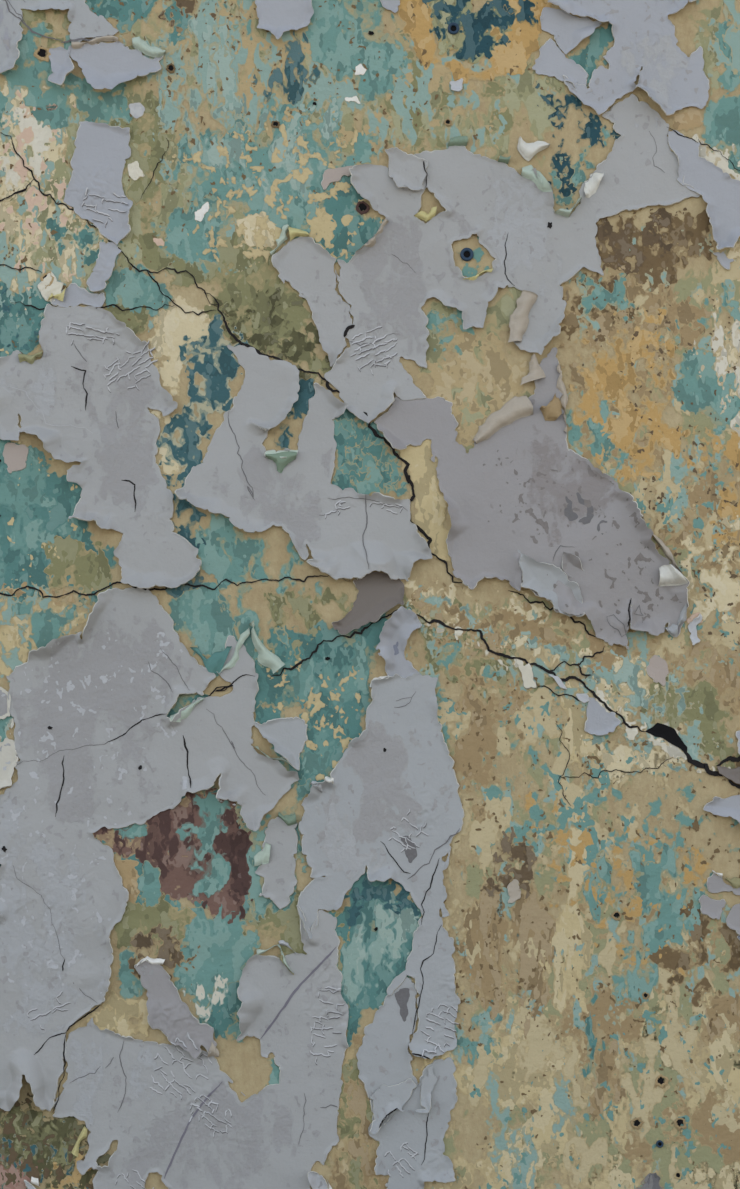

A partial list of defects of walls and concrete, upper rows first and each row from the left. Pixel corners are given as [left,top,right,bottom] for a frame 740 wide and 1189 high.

flaking render [657,328,690,433]
flaking render [717,411,740,448]
crack [17,590,646,817]
crack [557,725,740,806]